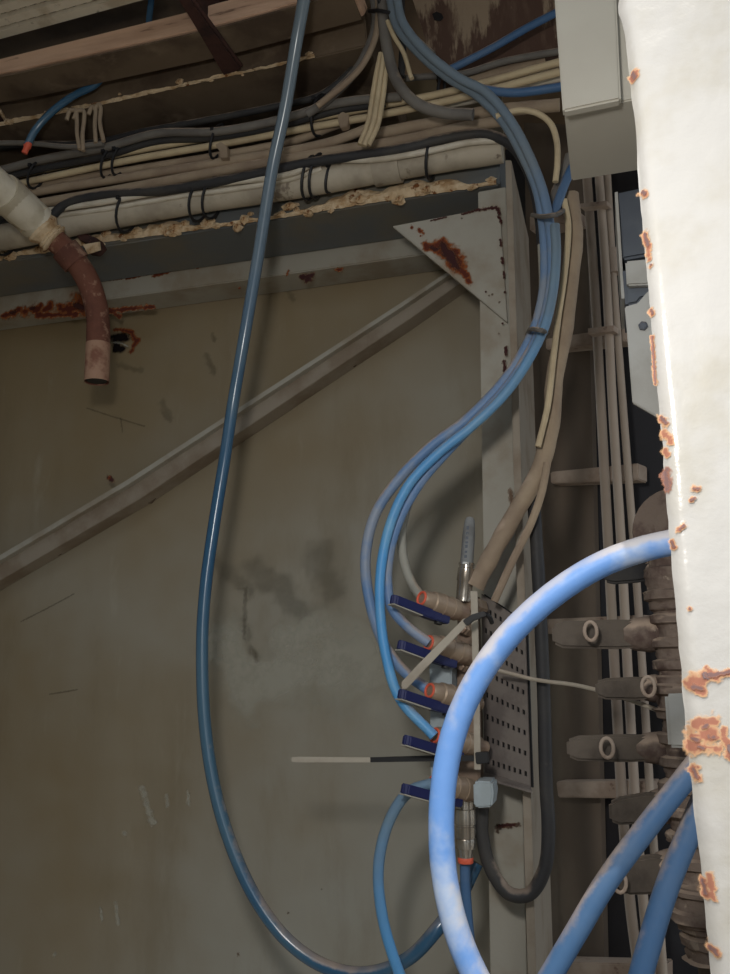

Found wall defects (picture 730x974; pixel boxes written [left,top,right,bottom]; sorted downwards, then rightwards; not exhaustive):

rust [270,176,497,220]
rust [0,244,50,261]
rust [74,212,258,257]
rust [410,226,473,284]
rust [0,293,86,320]
rust [658,415,674,493]
rust [668,523,686,550]
rust [682,665,730,697]
rust [683,716,730,782]